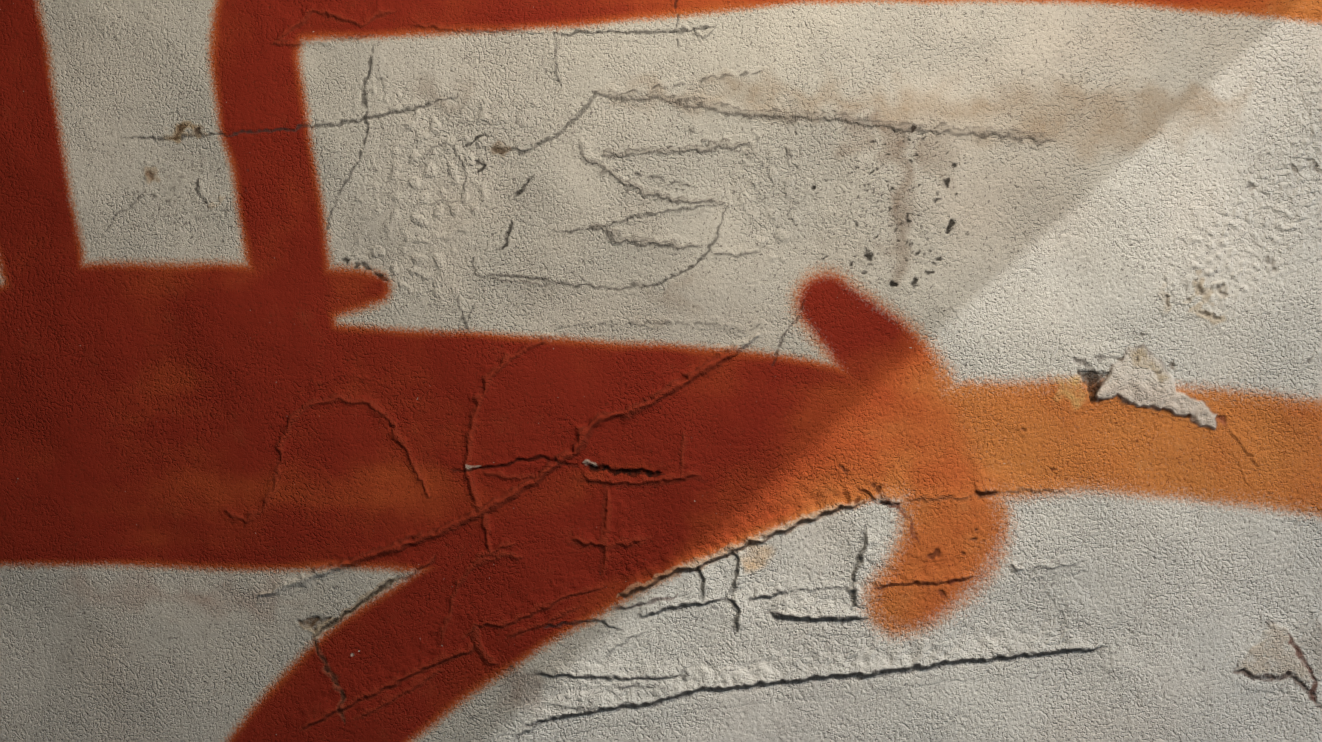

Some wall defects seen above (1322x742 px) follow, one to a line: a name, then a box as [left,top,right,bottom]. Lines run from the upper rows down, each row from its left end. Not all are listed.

crack [98,185,152,238]
crack [109,37,396,289]
crack [450,0,1061,380]
spalling [1155,272,1233,326]
crack [439,426,719,497]
spalling [1057,338,1278,491]
crack [469,474,1123,742]
peeling [1221,609,1322,724]